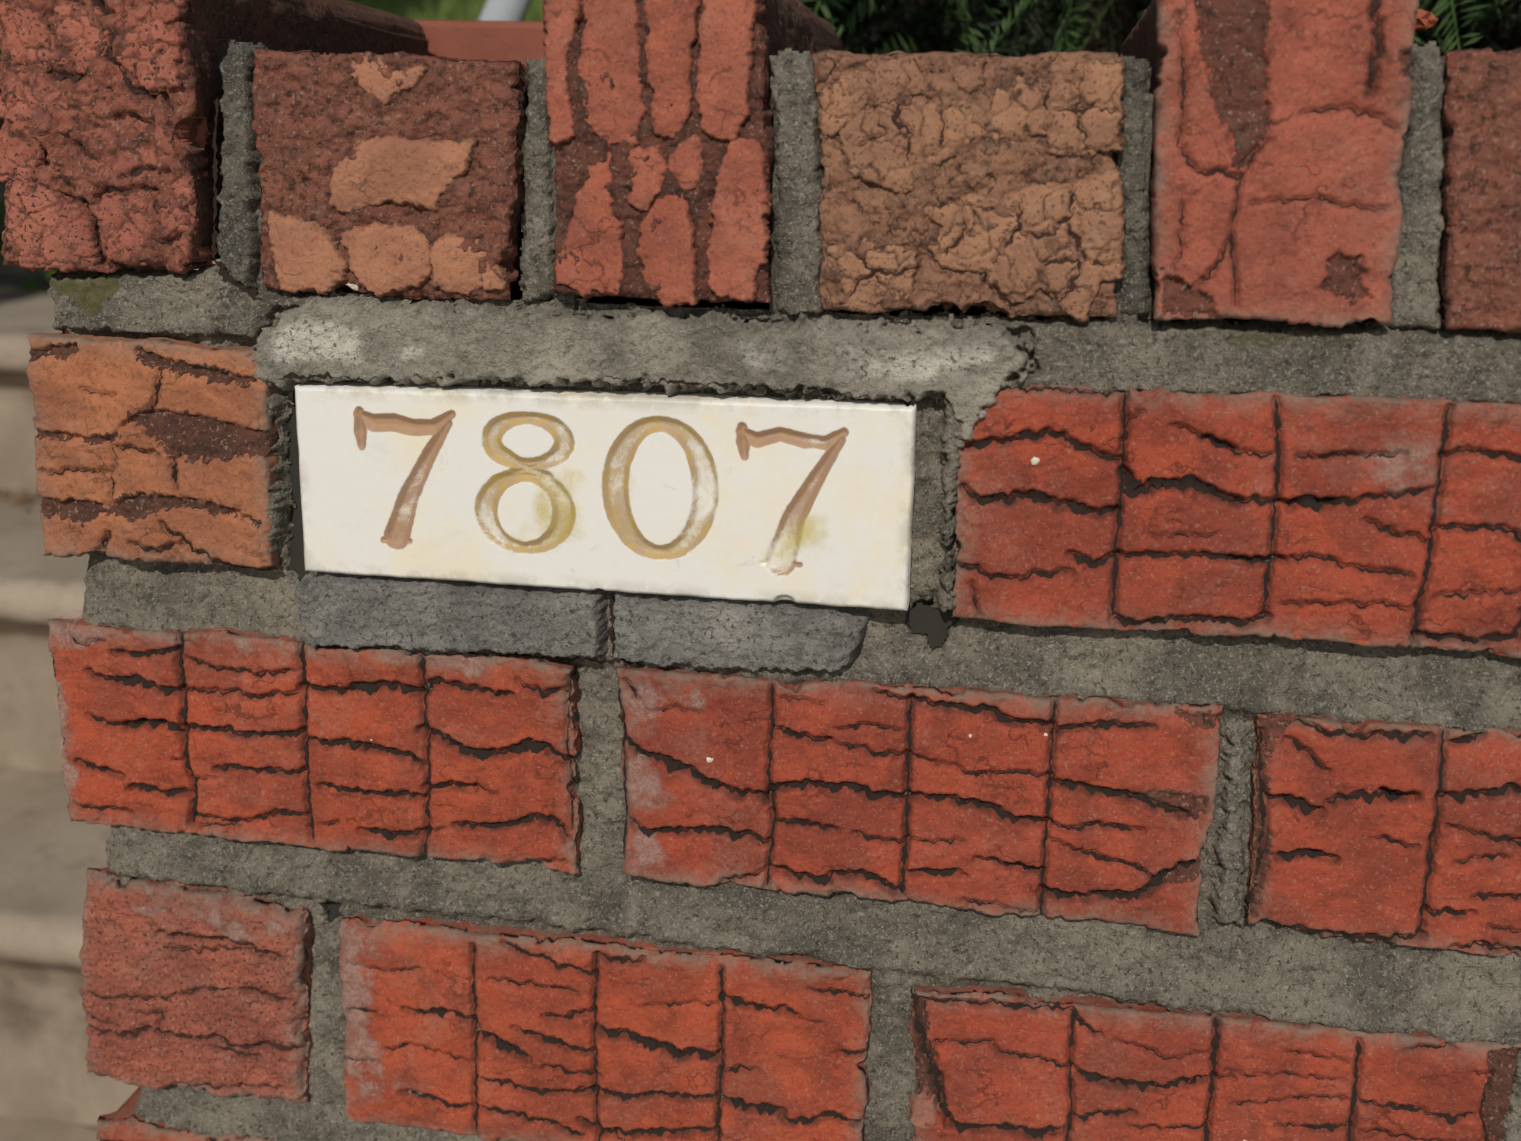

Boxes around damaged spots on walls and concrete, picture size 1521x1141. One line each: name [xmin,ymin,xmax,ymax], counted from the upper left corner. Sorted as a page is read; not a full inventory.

spalling [0,0,213,273]
spalling [254,50,525,300]
spalling [542,0,773,309]
crack [859,92,945,160]
crack [829,188,1118,302]
crack [1043,65,1116,151]
crack [1174,15,1387,305]
crack [1301,0,1396,129]
spalling [1439,53,1521,330]